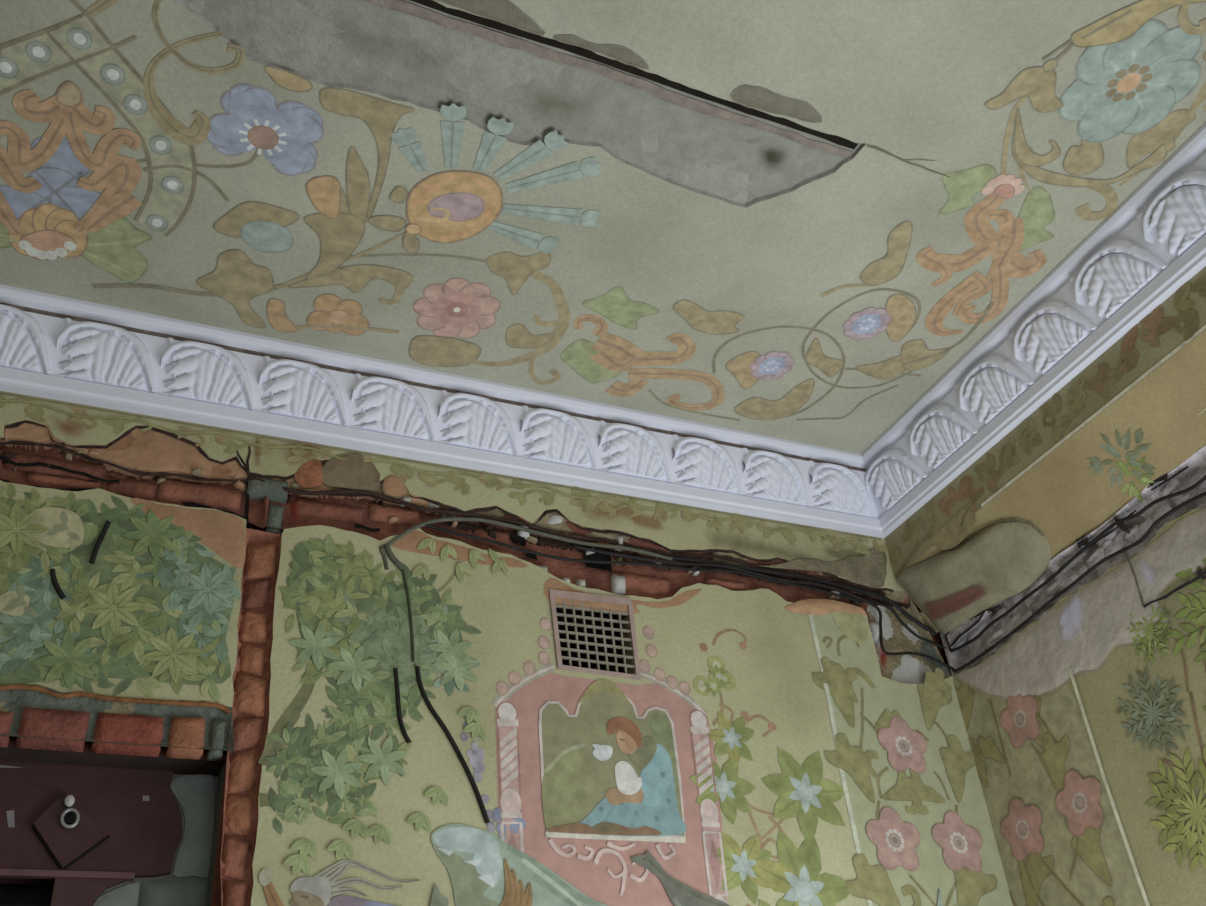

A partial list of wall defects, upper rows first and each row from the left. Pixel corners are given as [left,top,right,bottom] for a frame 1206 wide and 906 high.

peeling [180,0,863,204]
crack [866,145,950,177]
flaking render [0,420,1206,906]